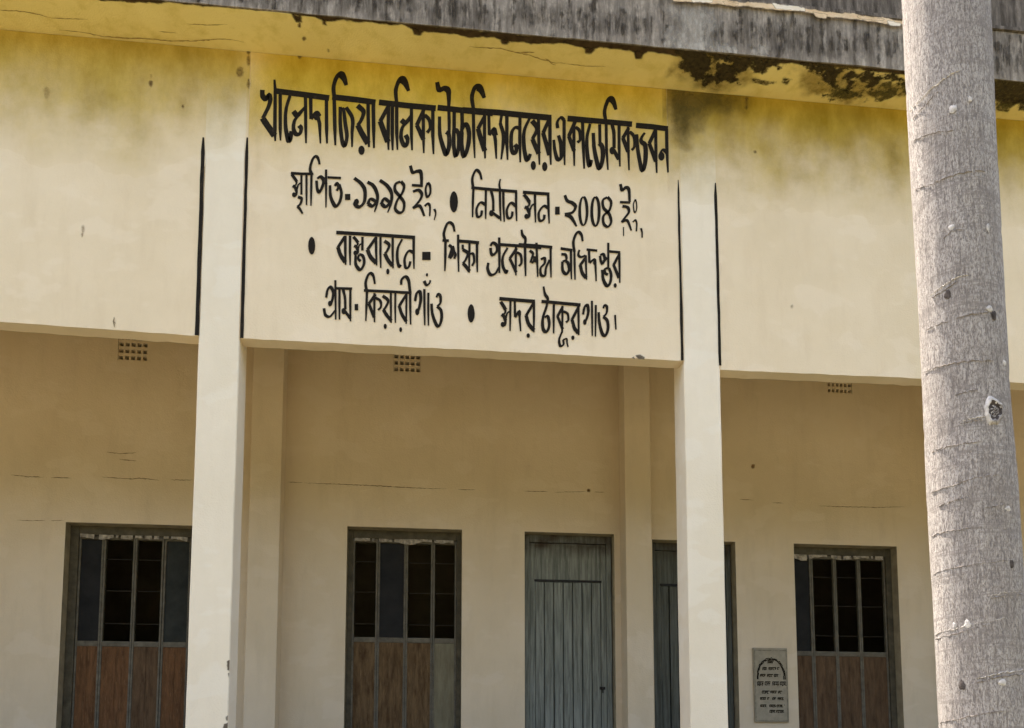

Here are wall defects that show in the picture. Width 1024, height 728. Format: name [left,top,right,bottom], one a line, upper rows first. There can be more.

water stain [0,0,913,225]
water stain [994,34,1024,230]
crack [107,452,184,481]
crack [291,482,474,490]